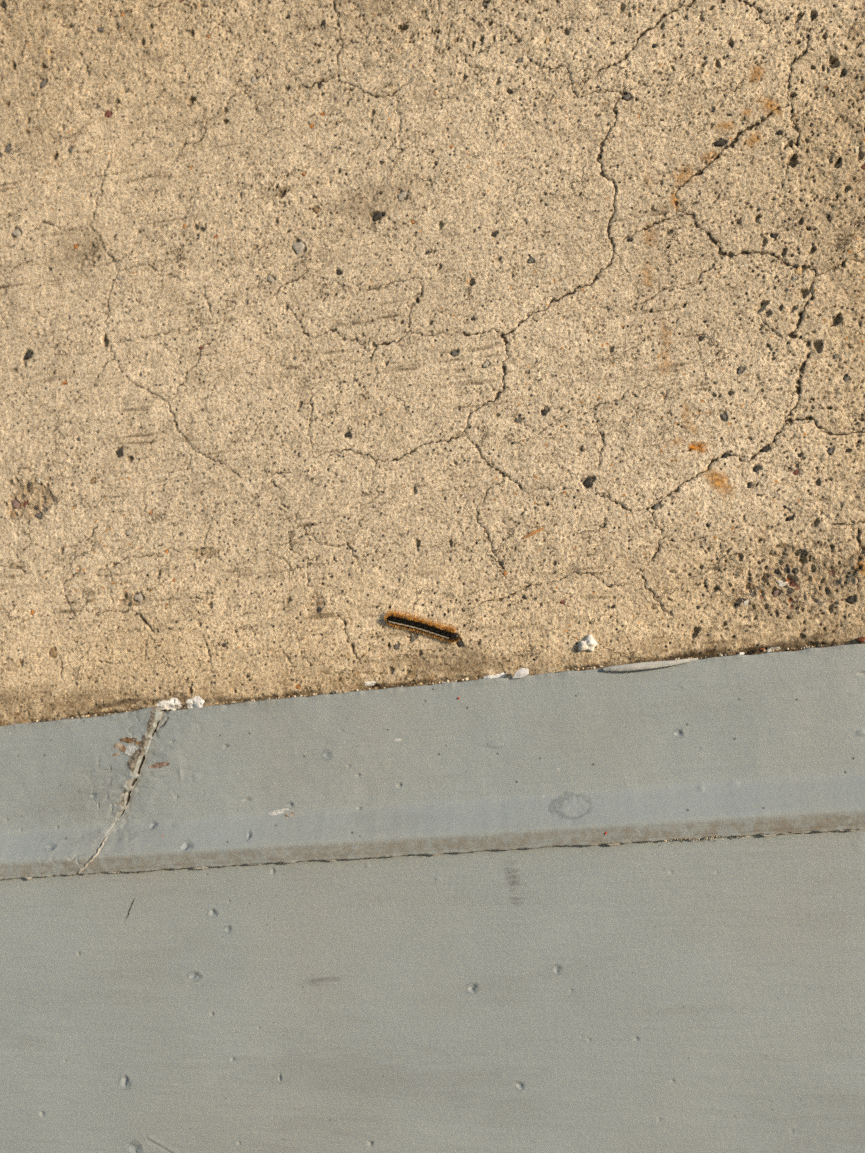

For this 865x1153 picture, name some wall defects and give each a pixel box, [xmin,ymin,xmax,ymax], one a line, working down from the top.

crack [15,161,240,516]
crack [269,0,865,615]
crack [1,525,213,678]
peeling [112,706,170,772]
crack [121,709,167,816]